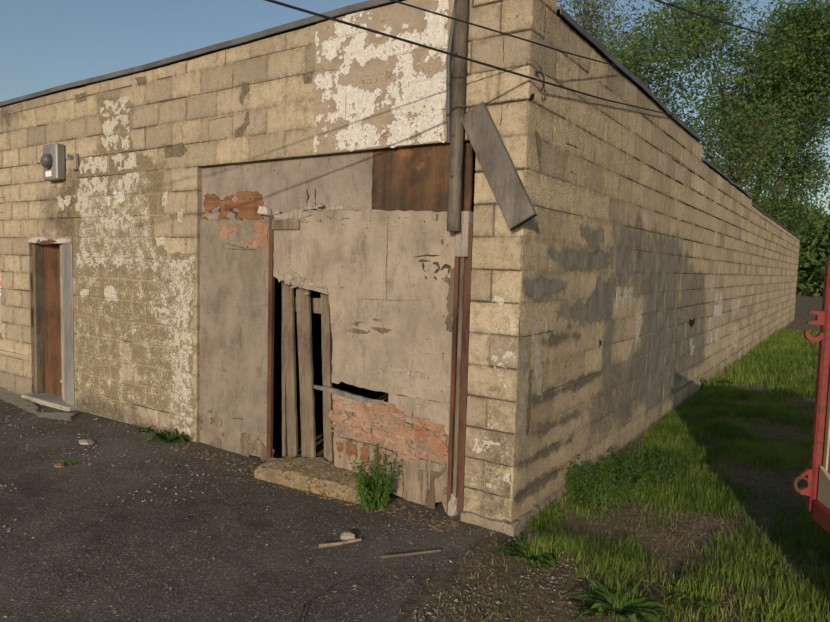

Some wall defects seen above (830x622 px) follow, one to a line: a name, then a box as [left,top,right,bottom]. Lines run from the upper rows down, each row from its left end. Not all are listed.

peeling [303,0,450,154]
peeling [57,97,139,230]
spalling [164,143,187,158]
peeling [76,235,193,434]
water stain [517,320,542,437]